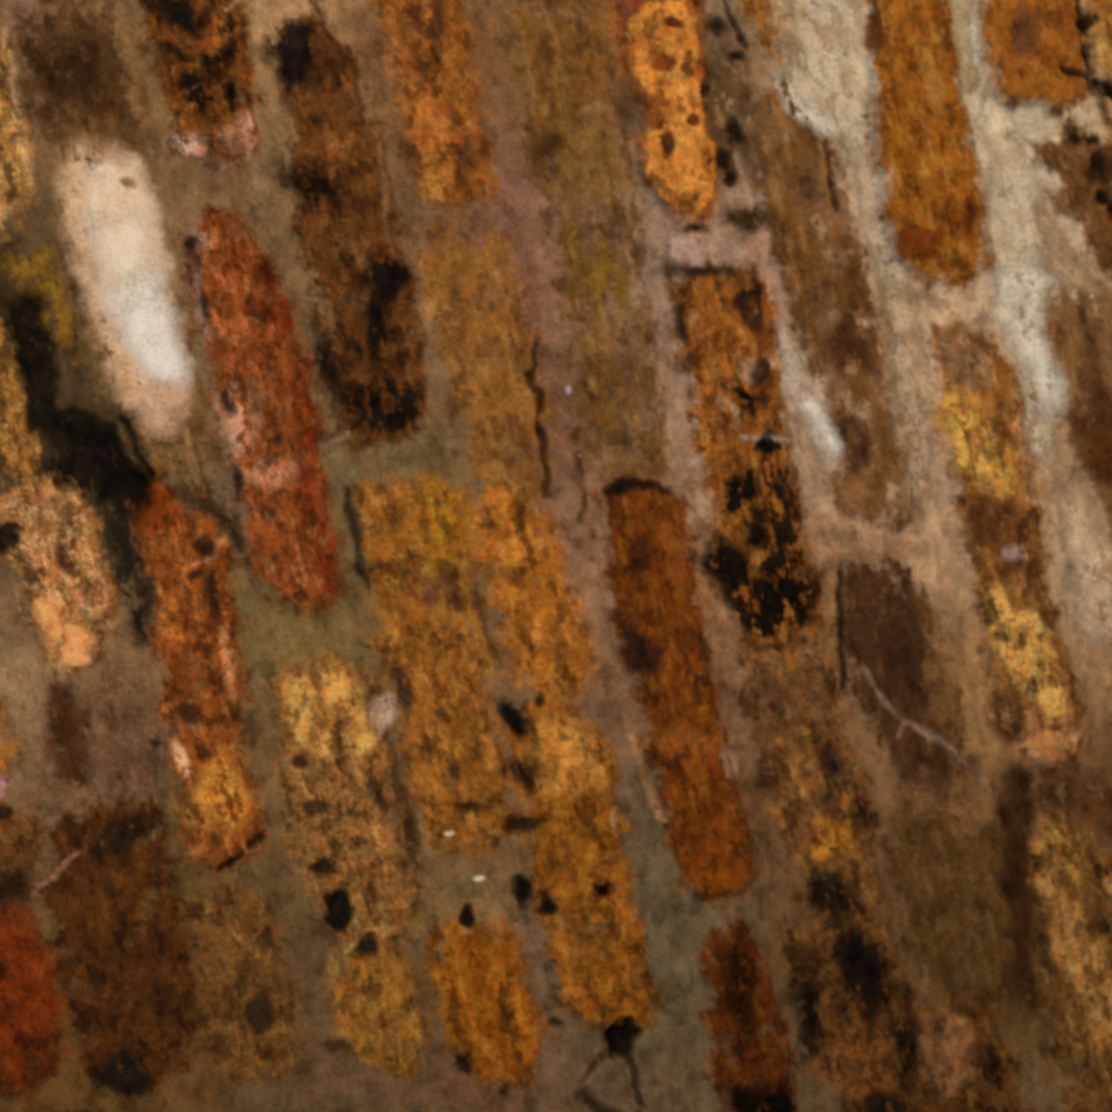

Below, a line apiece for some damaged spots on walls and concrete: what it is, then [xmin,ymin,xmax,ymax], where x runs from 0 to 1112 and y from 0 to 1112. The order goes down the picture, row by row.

efflorescence [56,145,191,430]
efflorescence [779,0,932,499]
efflorescence [951,0,1099,463]
leakage [1073,313,1112,485]
spalling [0,484,109,668]
efflorescence [1058,484,1112,643]